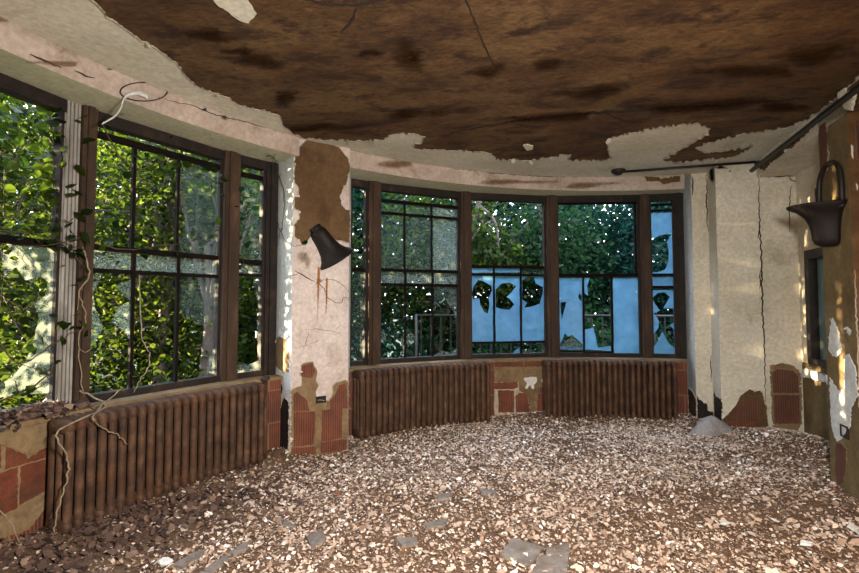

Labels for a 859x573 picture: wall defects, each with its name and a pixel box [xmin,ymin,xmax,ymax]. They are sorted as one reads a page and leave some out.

water stain [188,31,274,65]
peeling [91,0,859,246]
water stain [517,113,588,121]
water stain [579,86,617,97]
spalling [275,336,350,455]
spalling [494,377,543,416]
spalling [688,318,859,485]
spalling [0,444,48,538]